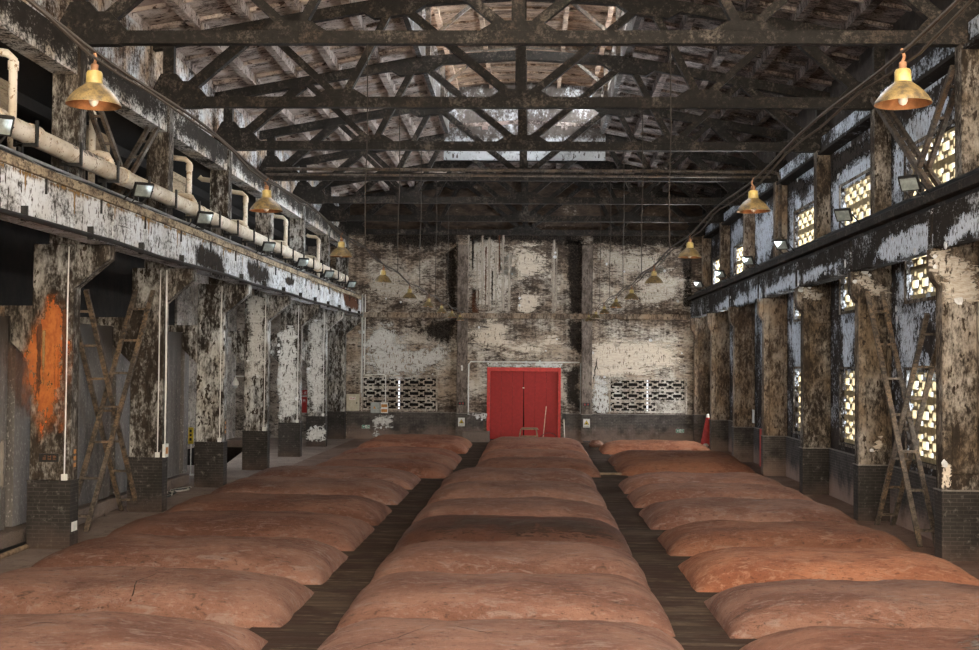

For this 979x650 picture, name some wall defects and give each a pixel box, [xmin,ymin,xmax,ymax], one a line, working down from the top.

flaking render [892,97,949,198]
flaking render [755,201,773,264]
rust [23,296,71,436]
flaking render [246,294,267,378]
flaking render [276,319,325,420]
flaking render [468,319,564,368]
water stain [364,228,693,411]
flaking render [592,337,687,414]
flaking render [715,211,979,382]
spalling [305,425,326,442]